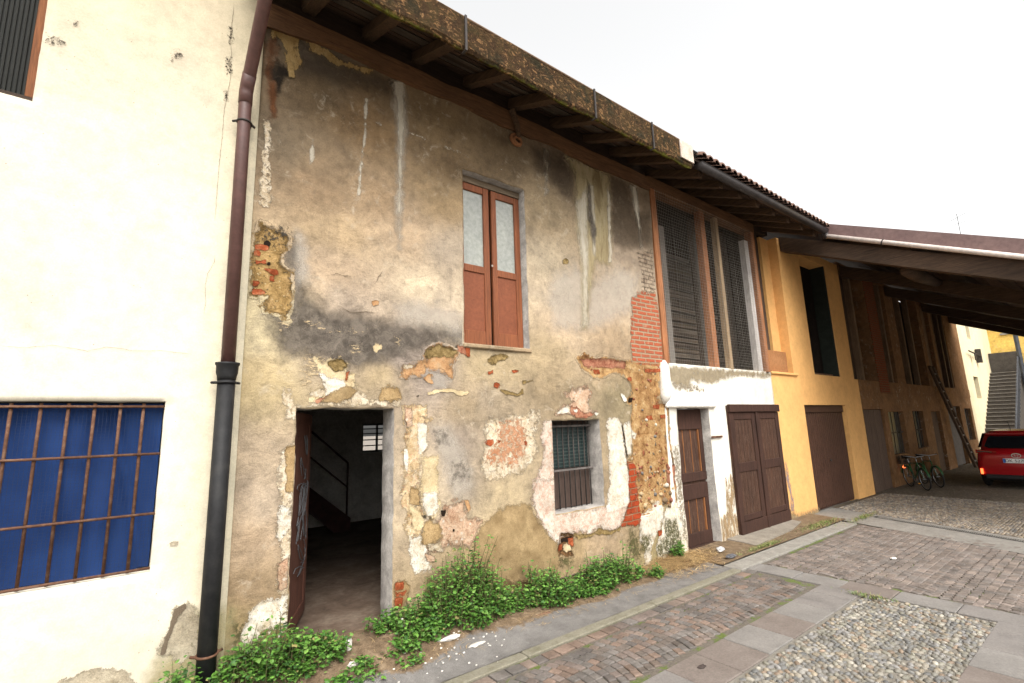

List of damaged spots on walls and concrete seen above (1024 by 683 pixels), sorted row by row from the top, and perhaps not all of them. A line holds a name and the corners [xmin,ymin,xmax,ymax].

flaking render [247,119,295,331]
damp [266,60,289,90]
peeling [271,30,373,78]
damp [304,50,407,238]
damp [538,151,649,324]
flaking render [630,252,663,369]
peeling [156,600,199,663]
peeling [240,442,295,657]
peeling [281,321,483,610]
peeling [480,385,636,559]